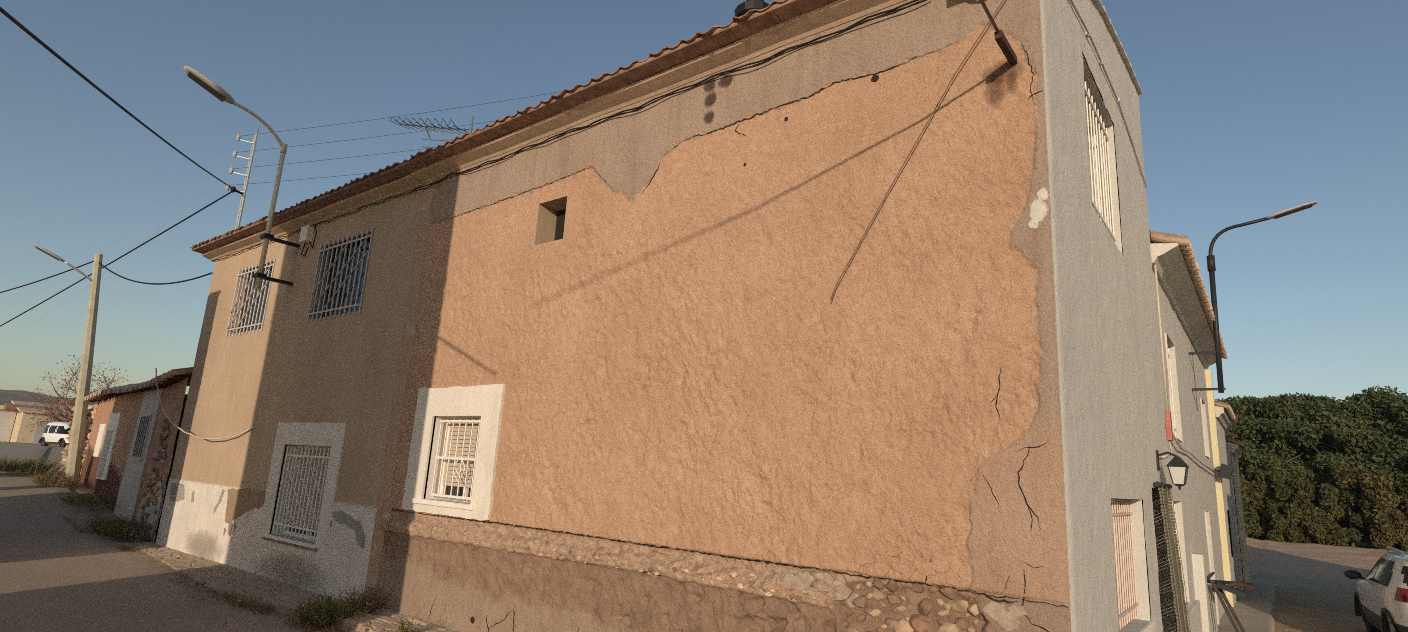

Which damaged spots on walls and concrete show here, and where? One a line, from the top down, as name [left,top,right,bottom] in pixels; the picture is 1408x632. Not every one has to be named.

crack [991,368,1001,416]
peeling [213,488,265,536]
spalling [387,520,1027,632]
crack [386,441,1068,632]